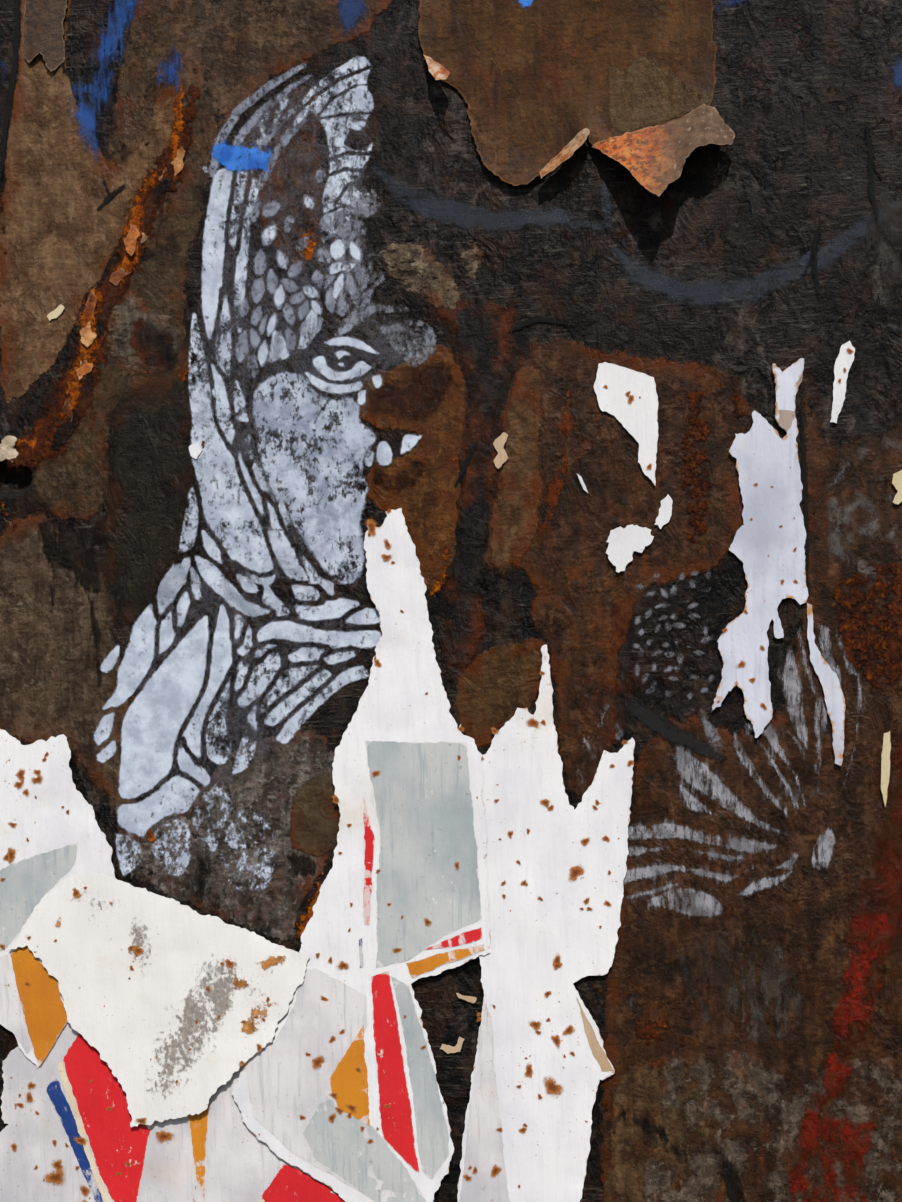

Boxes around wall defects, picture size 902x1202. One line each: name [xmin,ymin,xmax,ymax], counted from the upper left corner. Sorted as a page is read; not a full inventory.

peeling [423,54,450,80]
peeling [539,104,735,197]